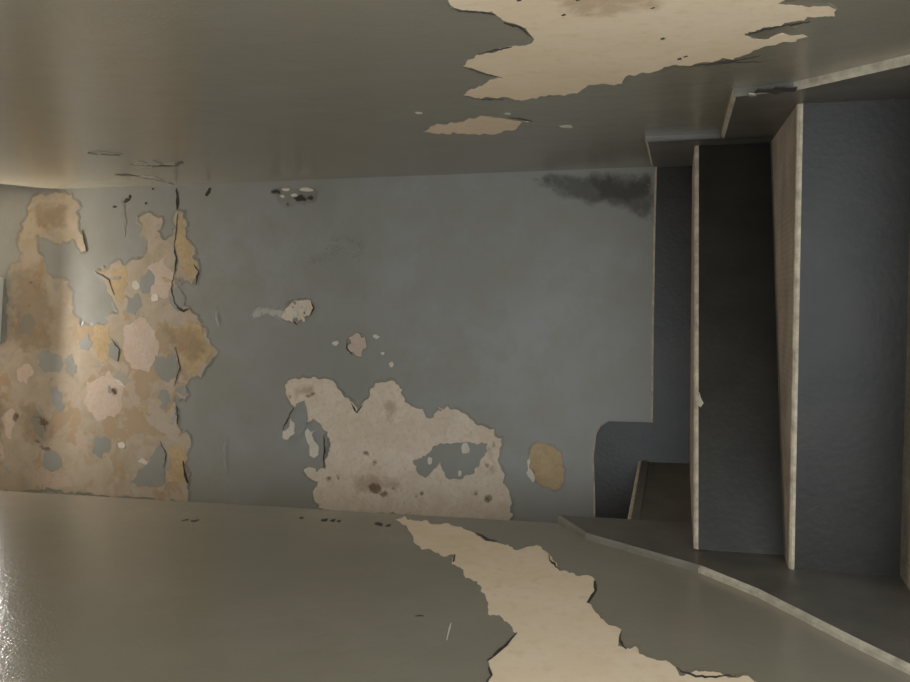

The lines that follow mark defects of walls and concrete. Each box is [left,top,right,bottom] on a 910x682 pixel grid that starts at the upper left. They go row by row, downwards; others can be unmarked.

peeling [446,0,840,102]
peeling [423,113,532,136]
spalling [271,187,318,208]
crack [171,188,188,312]
peeling [0,189,220,502]
peeling [252,297,315,326]
peeling [332,332,379,358]
peeling [282,352,762,682]